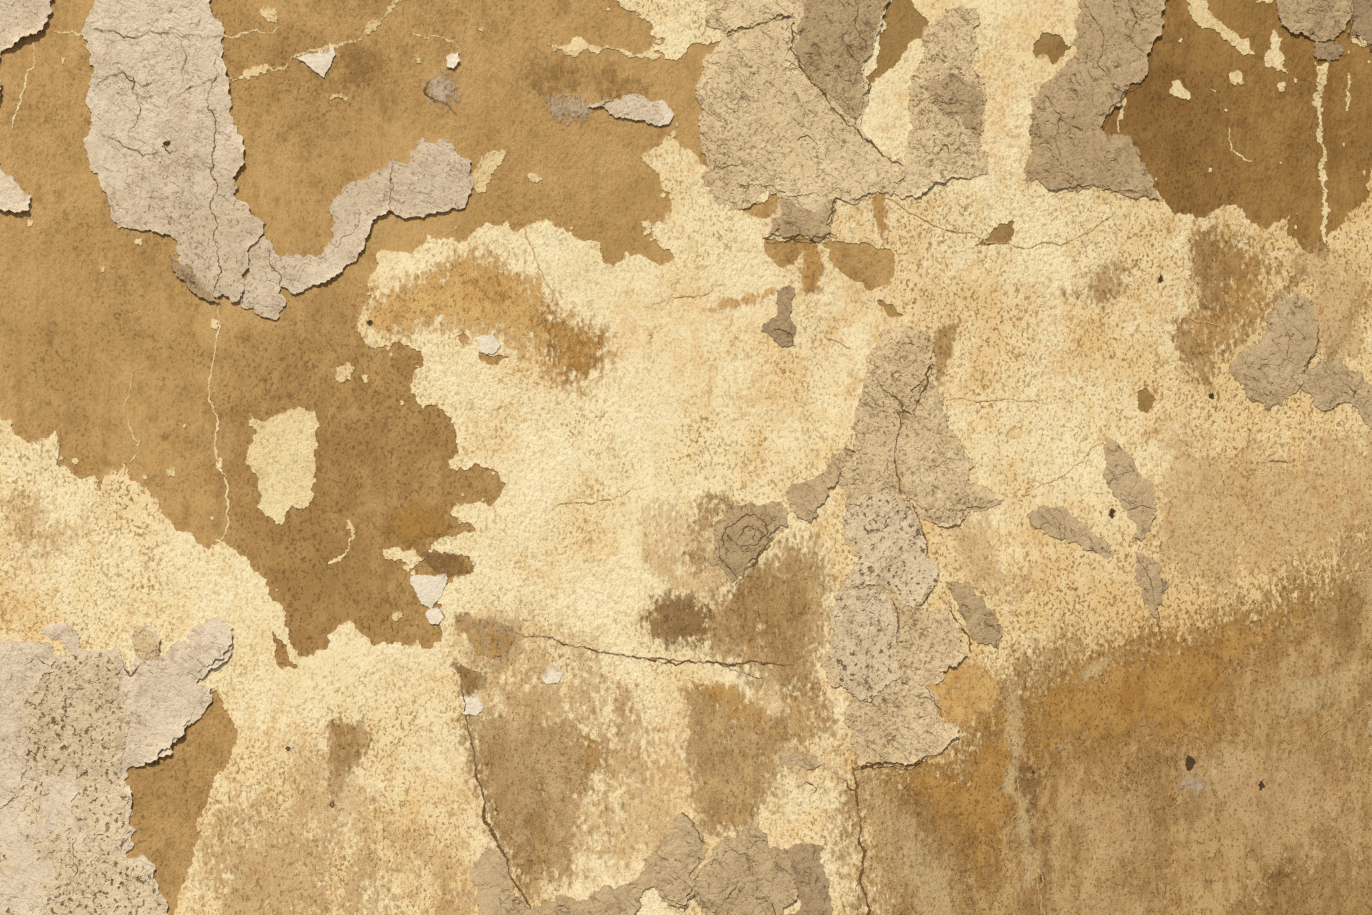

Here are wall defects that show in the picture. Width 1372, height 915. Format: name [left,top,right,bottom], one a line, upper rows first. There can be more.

peeling [1024,0,1372,264]
peeling [975,219,1014,246]
peeling [0,0,1003,769]
peeling [1229,293,1372,429]
peeling [1027,505,1115,558]
peeling [1102,436,1169,632]
peeling [0,616,238,915]
crack [461,686,531,910]
crack [509,630,793,678]
peeling [470,812,833,915]
water stain [832,511,1372,915]